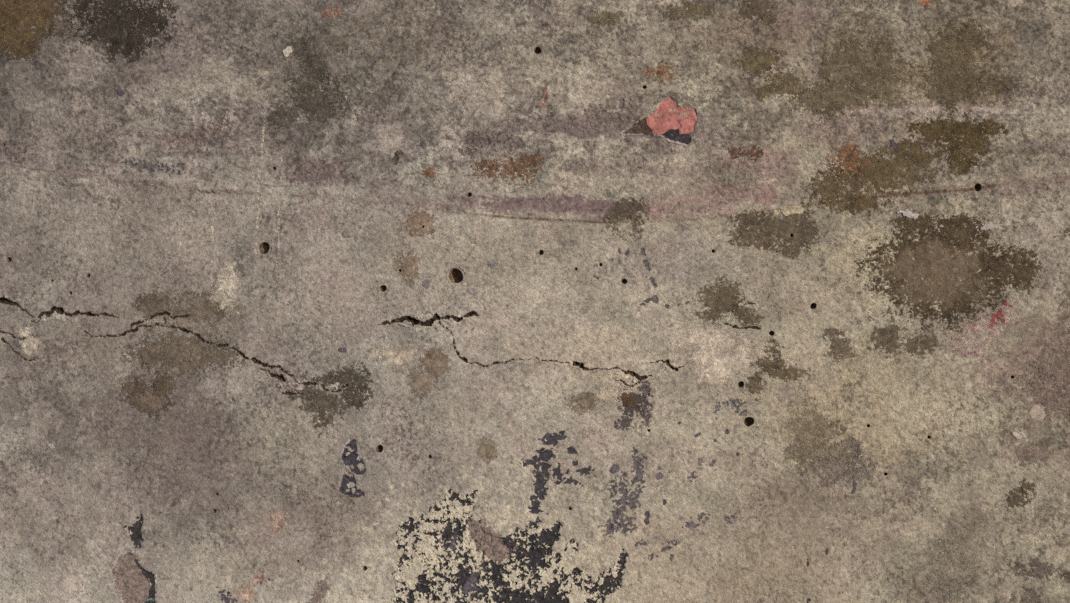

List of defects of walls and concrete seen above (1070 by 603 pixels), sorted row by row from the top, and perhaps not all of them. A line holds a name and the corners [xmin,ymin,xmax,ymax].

peeling [559,96,699,146]
water stain [728,17,1042,363]
crack [0,295,348,396]
crack [379,310,688,387]
peeling [339,438,366,498]
peeling [687,458,717,484]
peeling [389,430,678,603]
peeling [682,512,710,531]
peeling [112,514,161,603]
peeling [216,587,237,603]
peeling [306,580,332,603]